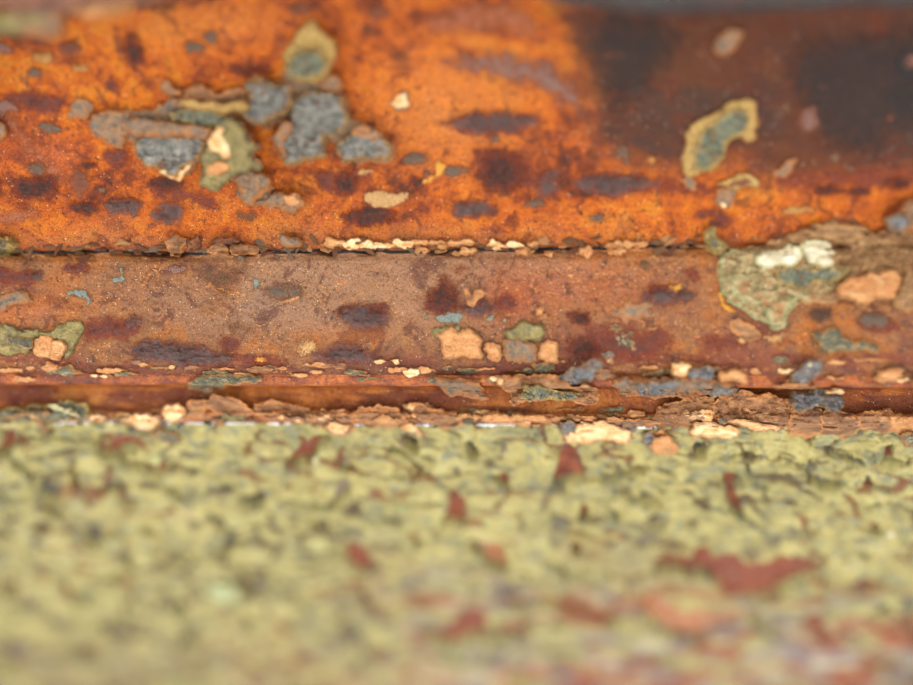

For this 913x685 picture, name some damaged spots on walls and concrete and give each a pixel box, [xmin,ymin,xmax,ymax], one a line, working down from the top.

corrosion [0,90,95,183]
peeling [69,1,430,240]
corrosion [288,167,409,208]
spalling [441,110,538,219]
peeling [680,99,763,178]
corrosion [84,316,287,370]
peeling [0,276,619,393]
corrosion [322,236,555,258]
corrosion [586,268,749,385]
peeling [717,240,853,343]
corrosion [703,199,913,316]
peeling [771,356,885,384]